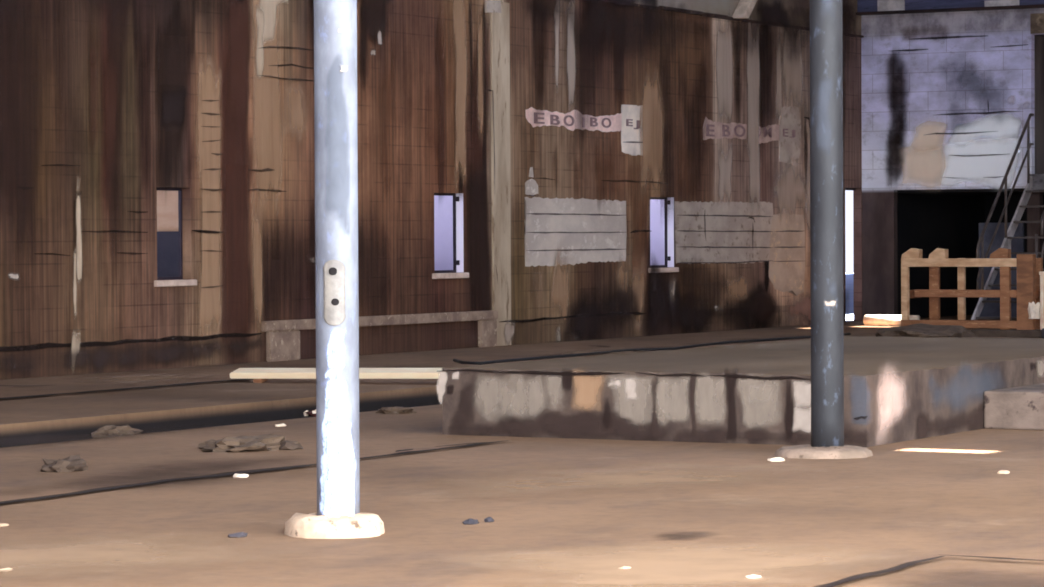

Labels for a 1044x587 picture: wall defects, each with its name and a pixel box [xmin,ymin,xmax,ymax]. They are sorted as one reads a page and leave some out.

damp [887,130,903,180]
peeling [914,115,1020,148]
damp [619,264,644,326]
peeling [320,329,356,518]